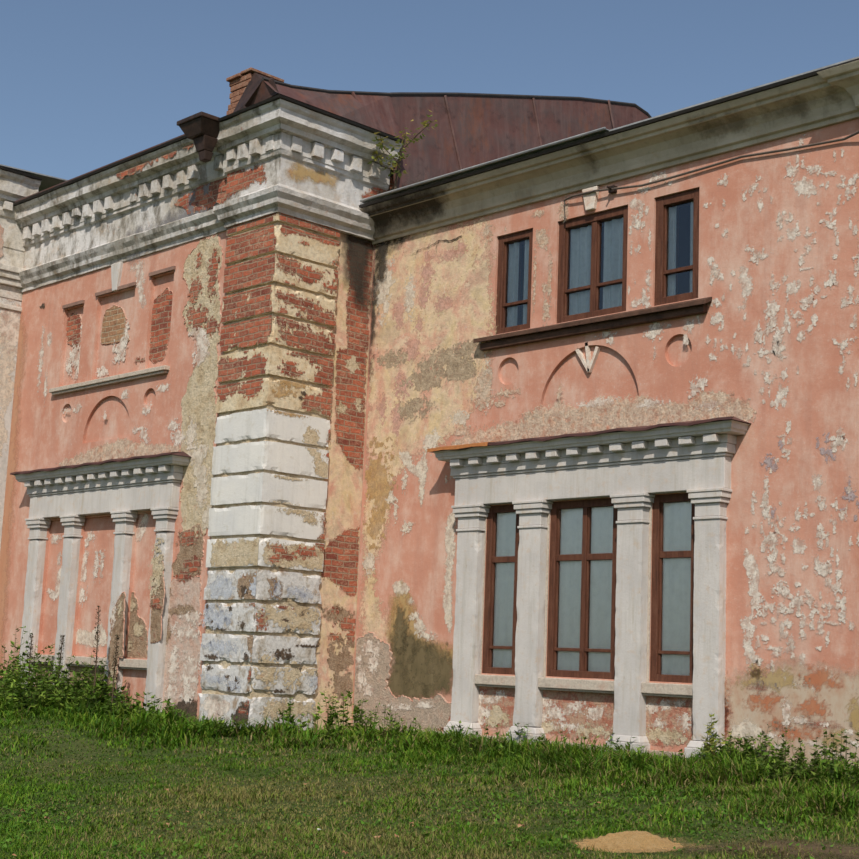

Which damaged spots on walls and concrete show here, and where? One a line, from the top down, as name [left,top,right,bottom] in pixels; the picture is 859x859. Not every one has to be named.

leakage [344,188,445,344]
flaking render [56,134,859,731]
leakage [386,583,453,700]
spalling [539,690,614,742]
spalling [646,696,693,748]
leakage [724,658,859,768]